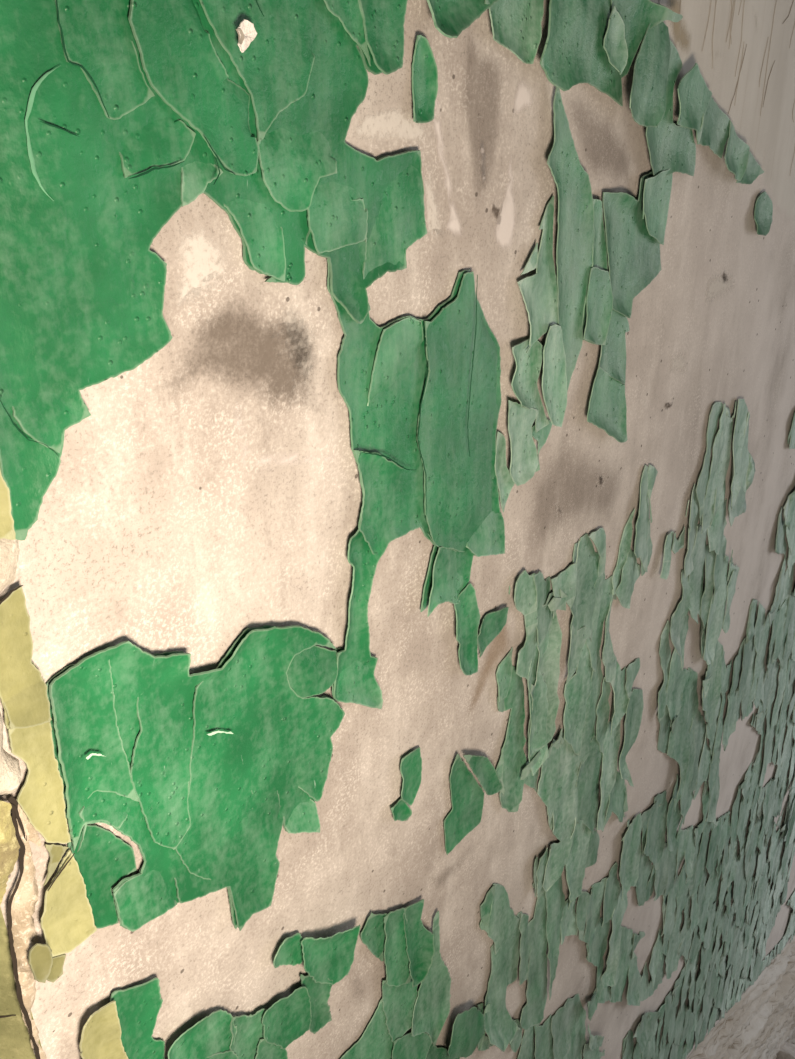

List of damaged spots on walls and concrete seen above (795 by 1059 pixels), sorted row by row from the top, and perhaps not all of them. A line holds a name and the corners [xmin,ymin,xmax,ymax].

peeling [427,0,544,64]
damp [180,233,224,302]
peeling [495,0,764,512]
peeling [754,191,773,236]
damp [197,312,312,398]
peeling [0,0,509,1059]
peeling [79,399,795,1059]
crack [48,853,75,891]
crack [0,796,41,1059]